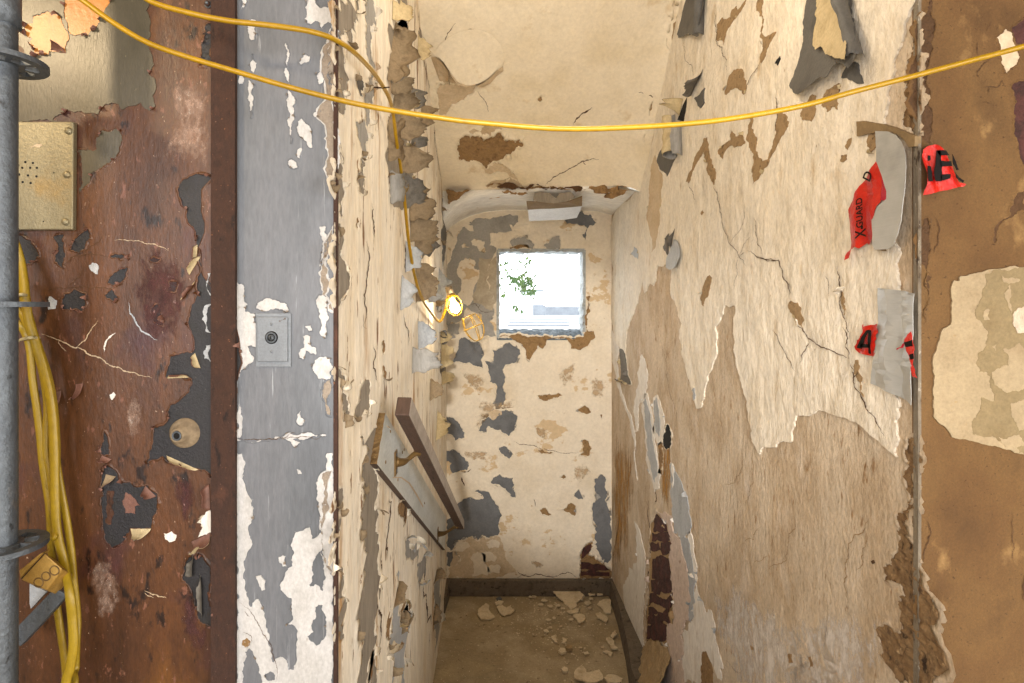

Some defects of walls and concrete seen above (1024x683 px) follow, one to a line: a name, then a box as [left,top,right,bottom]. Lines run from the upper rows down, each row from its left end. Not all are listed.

peeling [19,0,156,122]
corrosion [170,88,202,147]
peeling [233,0,597,683]
peeling [454,0,956,683]
crack [689,187,884,435]
peeling [932,266,1024,455]